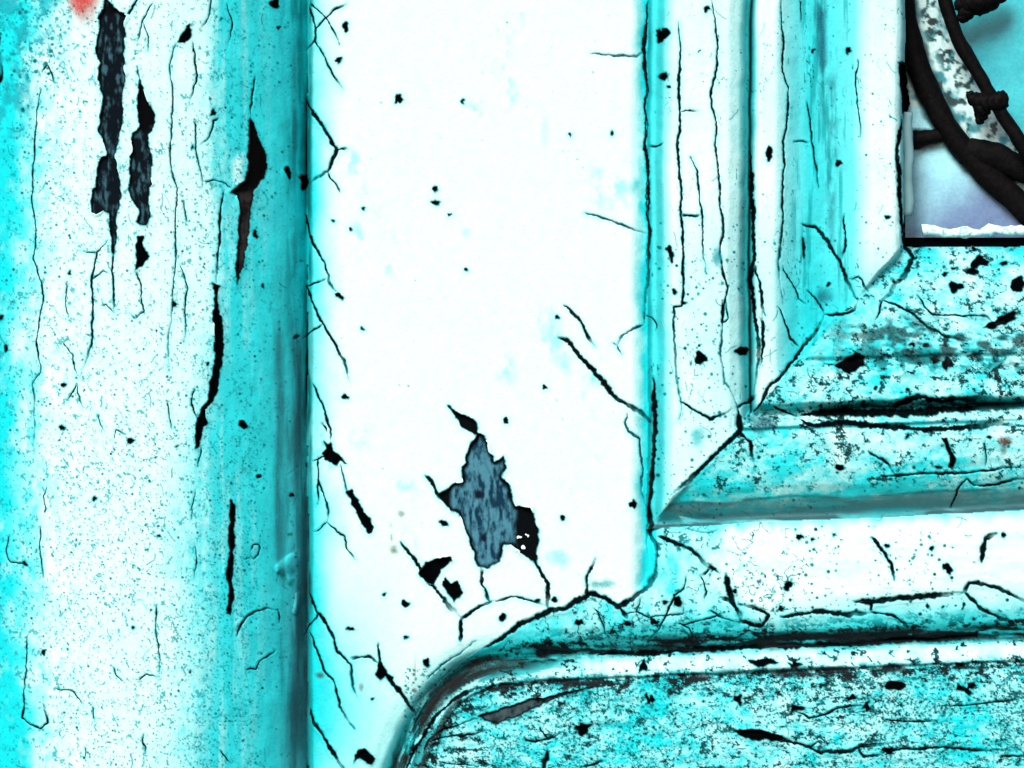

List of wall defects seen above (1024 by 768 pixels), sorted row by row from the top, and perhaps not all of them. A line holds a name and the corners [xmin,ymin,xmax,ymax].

peeling [90,0,155,271]
peeling [231,118,267,284]
crack [305,100,345,190]
crack [401,1,1021,677]
spalling [835,352,865,374]
peeling [438,405,539,569]
spalling [419,553,463,601]
crack [305,593,480,768]